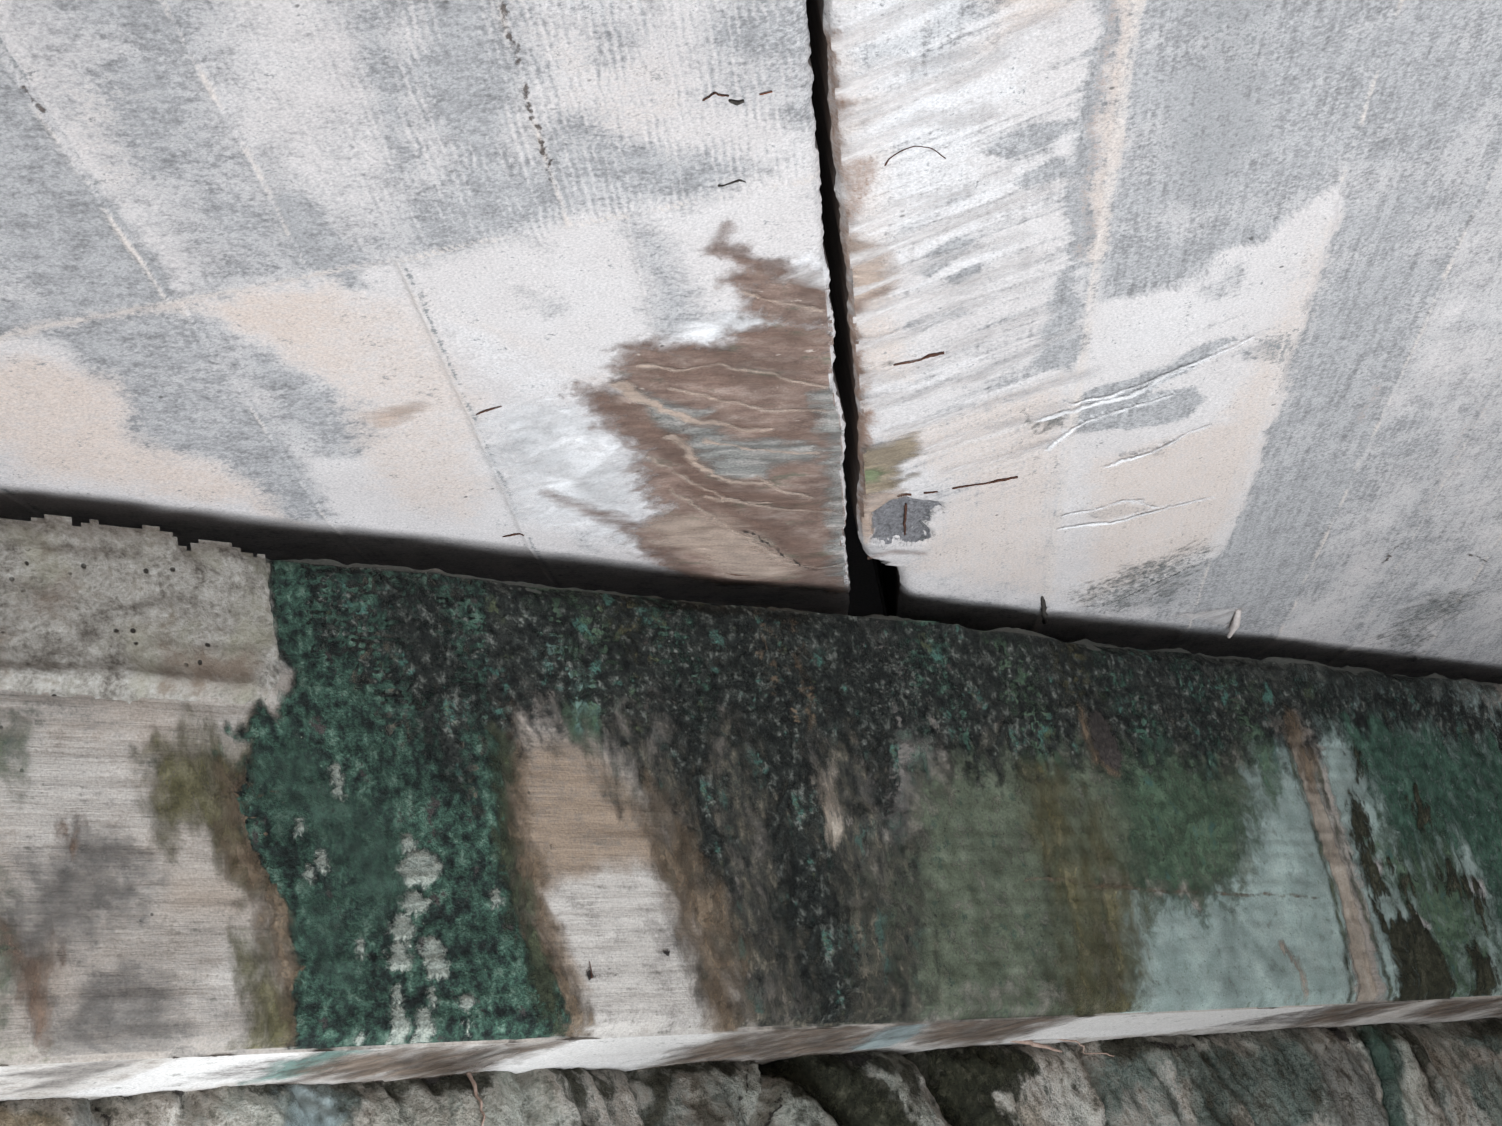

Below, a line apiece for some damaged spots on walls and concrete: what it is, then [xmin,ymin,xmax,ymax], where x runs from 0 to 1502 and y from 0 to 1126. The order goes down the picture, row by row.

water stain [854,273,908,296]
water stain [850,236,925,264]
water stain [853,288,954,325]
water stain [488,247,848,594]
water stain [863,417,954,493]
water stain [1029,337,1253,451]
spalling [870,496,945,550]
water stain [1073,541,1235,626]
water stain [604,619,950,1070]
water stain [917,752,1147,1046]
water stain [1295,999,1502,1027]
water stain [282,1041,565,1086]